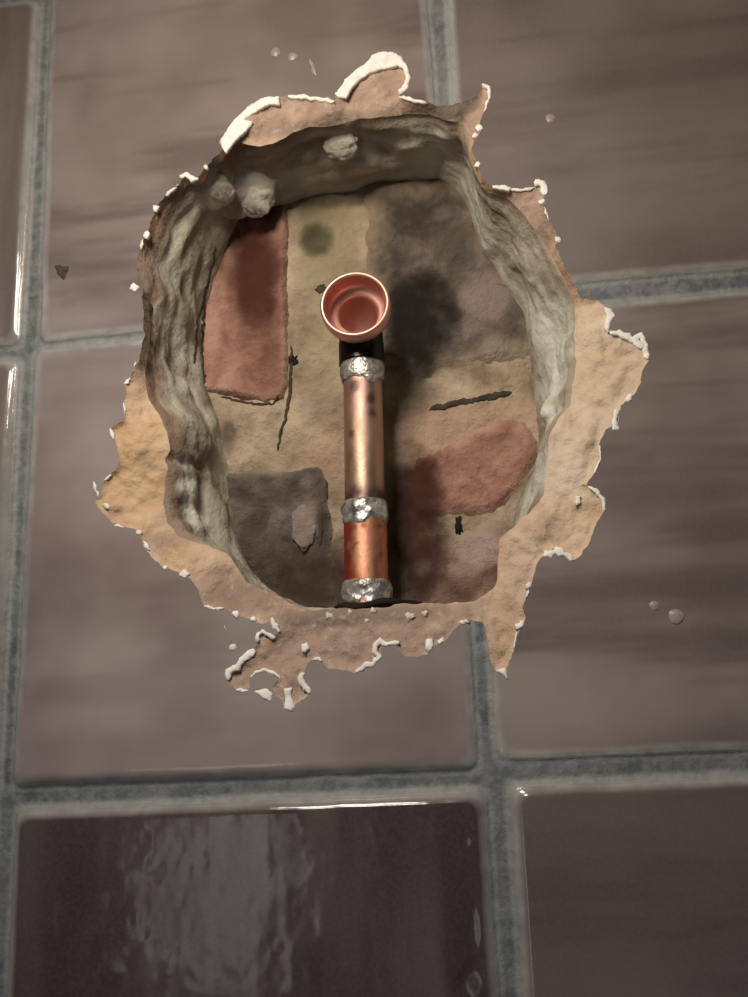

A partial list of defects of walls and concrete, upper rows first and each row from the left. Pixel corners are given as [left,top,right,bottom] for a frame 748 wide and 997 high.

crack [193,247,293,451]
spalling [93,51,650,711]
crack [429,391,512,411]